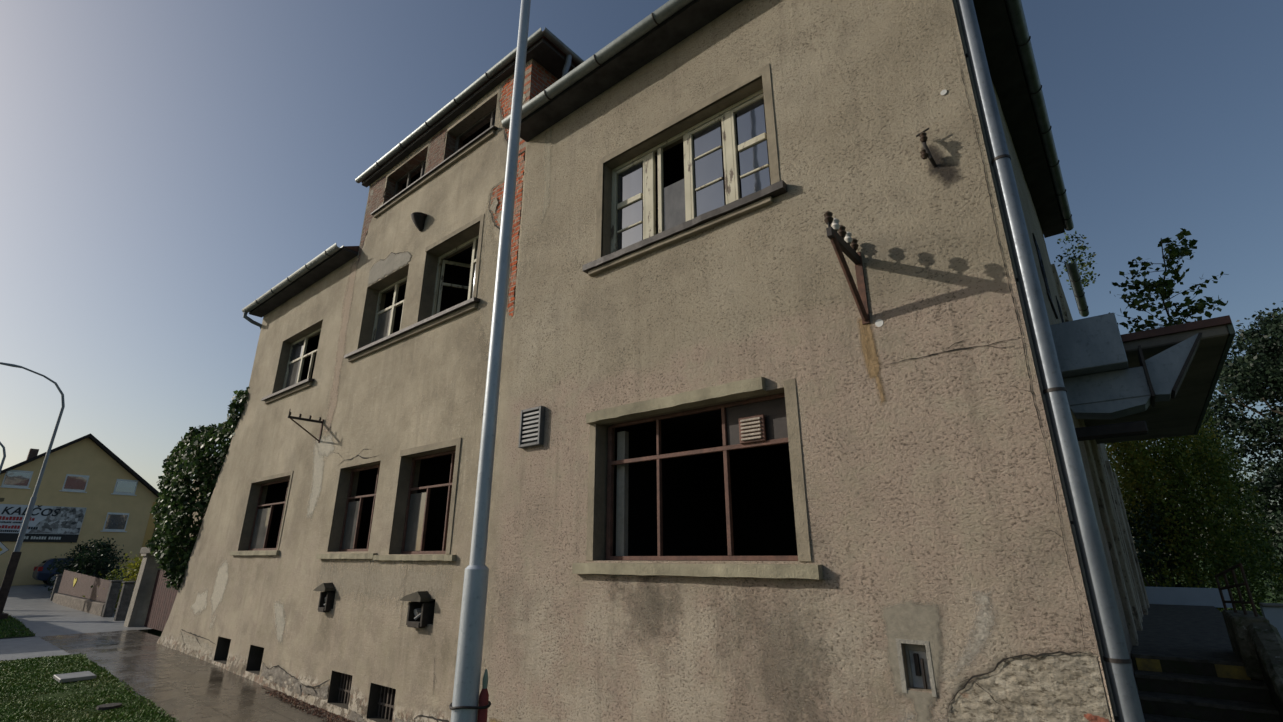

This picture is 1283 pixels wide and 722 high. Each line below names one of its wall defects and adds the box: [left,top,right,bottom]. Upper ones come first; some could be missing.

flaking render [499,75,526,144]
water stain [928,146,959,184]
flaking render [489,152,525,319]
rust [859,319,884,402]
crack [887,12,1085,647]
peeling [178,560,228,658]
flaking render [261,663,329,700]
flaking render [947,651,1111,722]